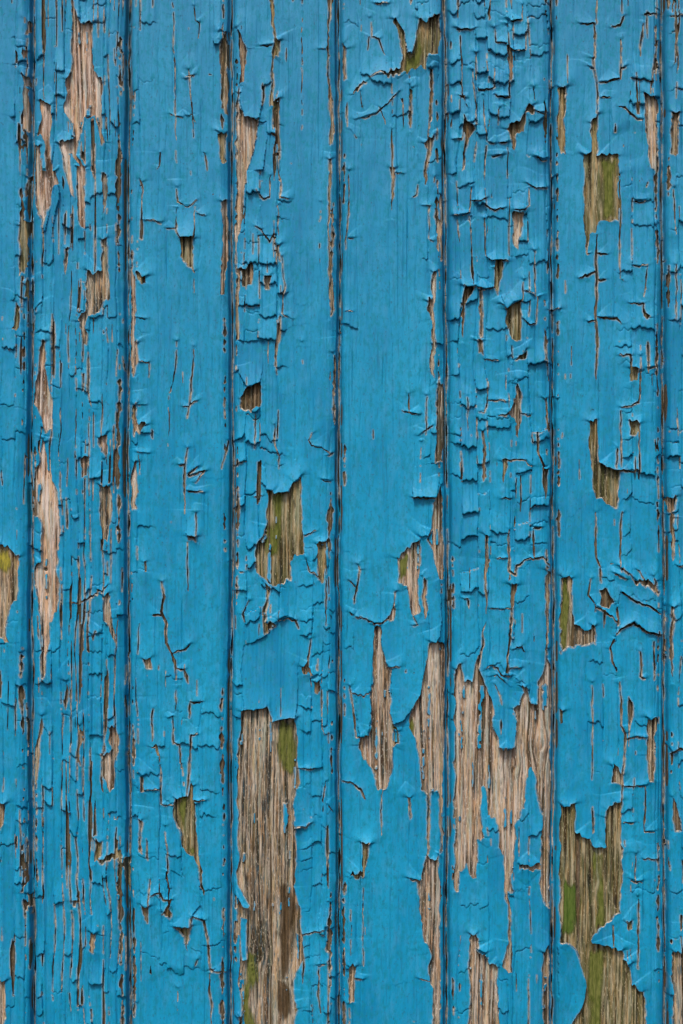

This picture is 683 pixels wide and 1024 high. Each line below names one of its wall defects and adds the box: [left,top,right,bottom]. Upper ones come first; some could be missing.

crack [262,87,303,173]
crack [457,20,547,158]
crack [583,8,680,120]
crack [470,186,534,283]
crack [580,227,647,378]
crack [616,354,657,479]
peeling [0,0,226,1024]
peeling [165,0,683,1024]
crack [503,459,549,576]
crack [587,511,662,679]
crack [151,548,203,802]
crack [620,699,649,832]